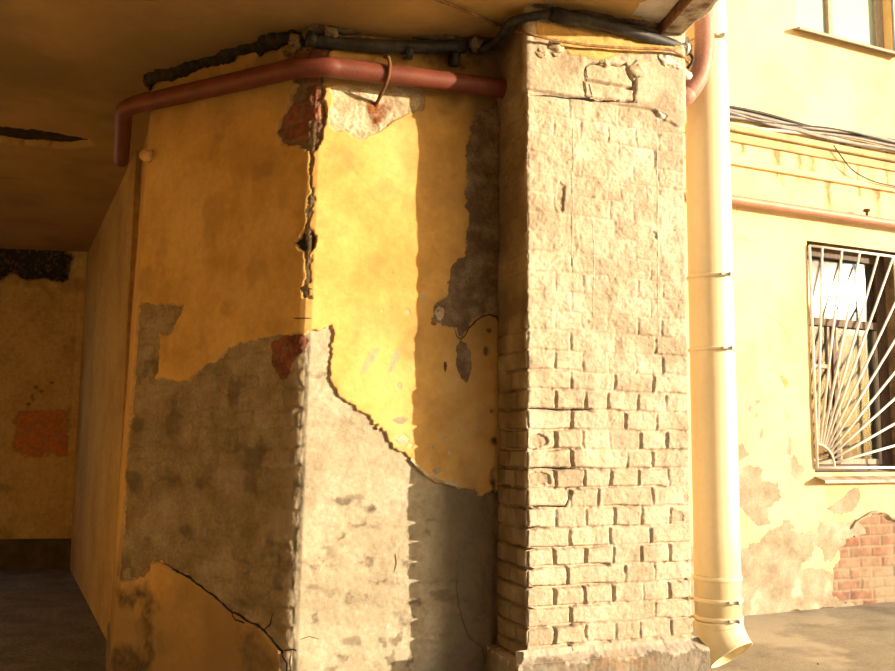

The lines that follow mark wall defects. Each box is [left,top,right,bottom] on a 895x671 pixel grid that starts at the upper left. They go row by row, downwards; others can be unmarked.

peeling [632,0,679,22]
peeling [278,77,424,151]
flaking render [583,65,633,103]
flaking render [430,102,501,382]
flaking render [119,303,502,671]
peeling [738,443,782,526]
flaking render [826,487,895,605]
crack [159,562,318,671]